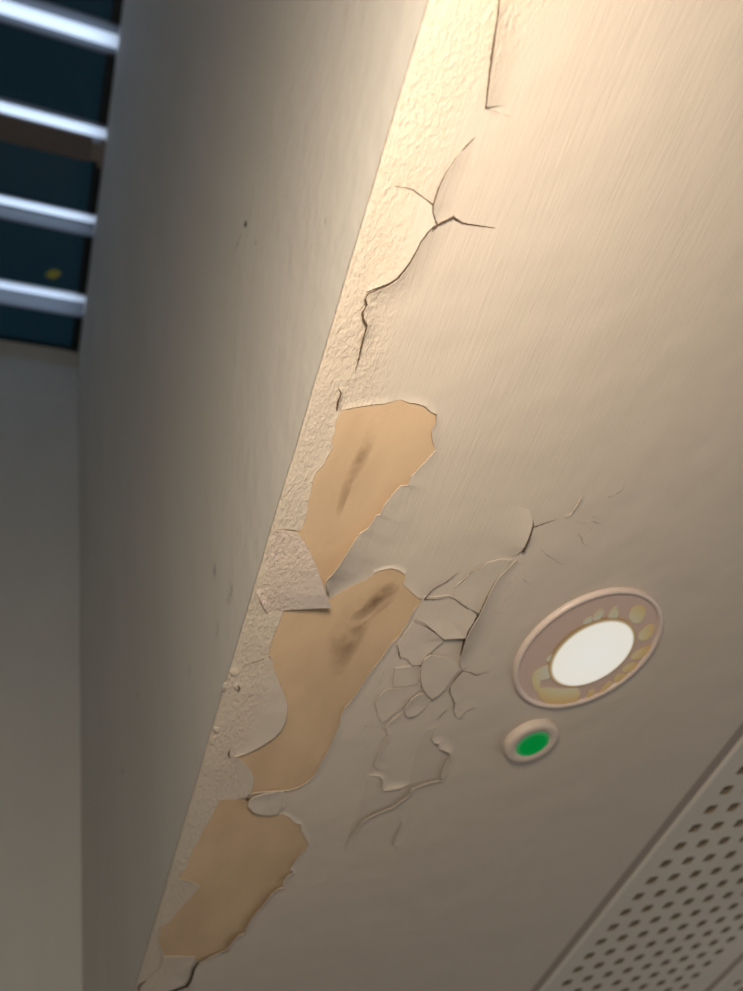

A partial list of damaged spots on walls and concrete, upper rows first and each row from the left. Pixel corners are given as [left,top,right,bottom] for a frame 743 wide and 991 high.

crack [336,136,494,411]
peeling [155,390,521,962]